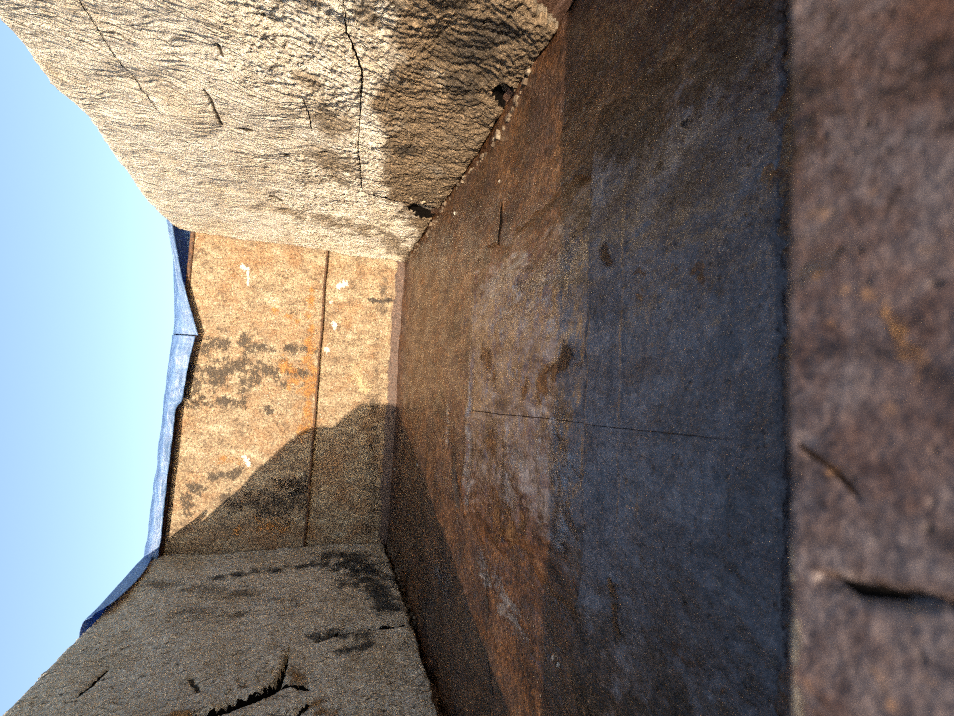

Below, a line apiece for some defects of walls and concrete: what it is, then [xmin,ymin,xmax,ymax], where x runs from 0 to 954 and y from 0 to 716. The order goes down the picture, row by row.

crack [343,0,426,205]
rust [271,287,318,442]
rust [521,340,577,405]
crack [471,410,728,440]
crack [798,443,859,498]
crack [828,575,954,607]
crack [77,670,109,698]
crack [195,659,310,716]